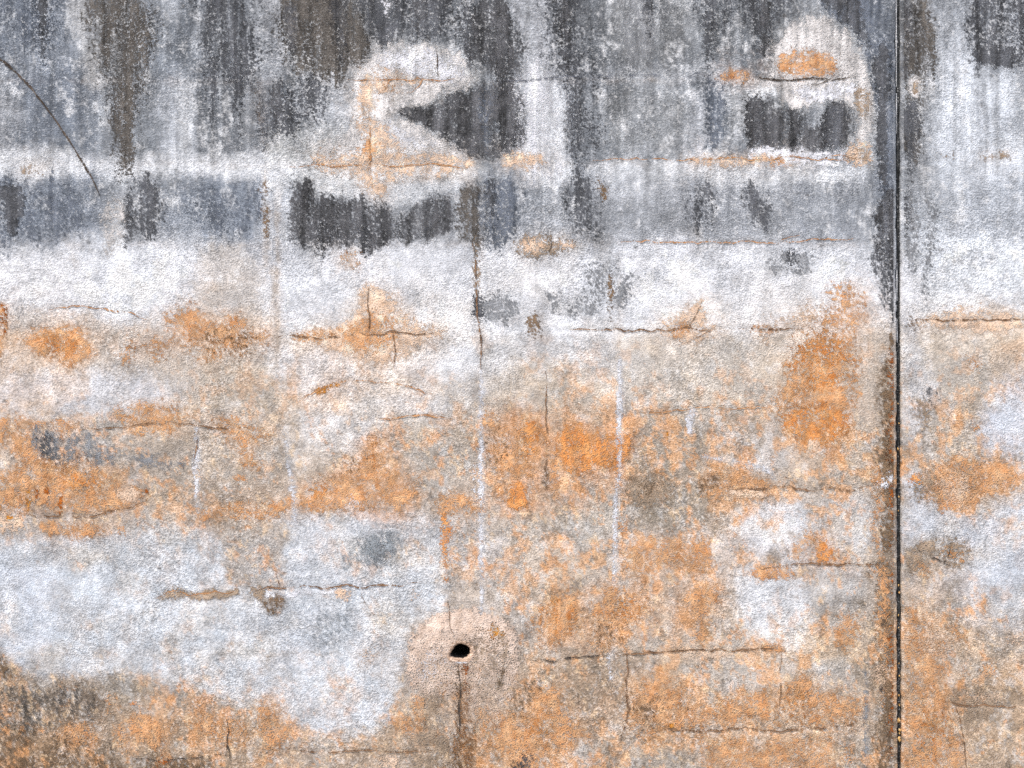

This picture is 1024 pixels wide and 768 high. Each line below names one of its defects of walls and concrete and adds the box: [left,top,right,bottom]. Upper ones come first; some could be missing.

crack [0,59,100,196]
leakage [80,0,166,248]
leakage [189,0,609,339]
leakage [741,93,855,152]
leakage [821,0,942,328]
crack [278,287,452,421]
rust [293,284,447,370]
rust [752,281,866,456]
crack [158,576,421,602]
rust [480,410,785,669]
rust [623,326,997,768]
crack [525,646,865,746]